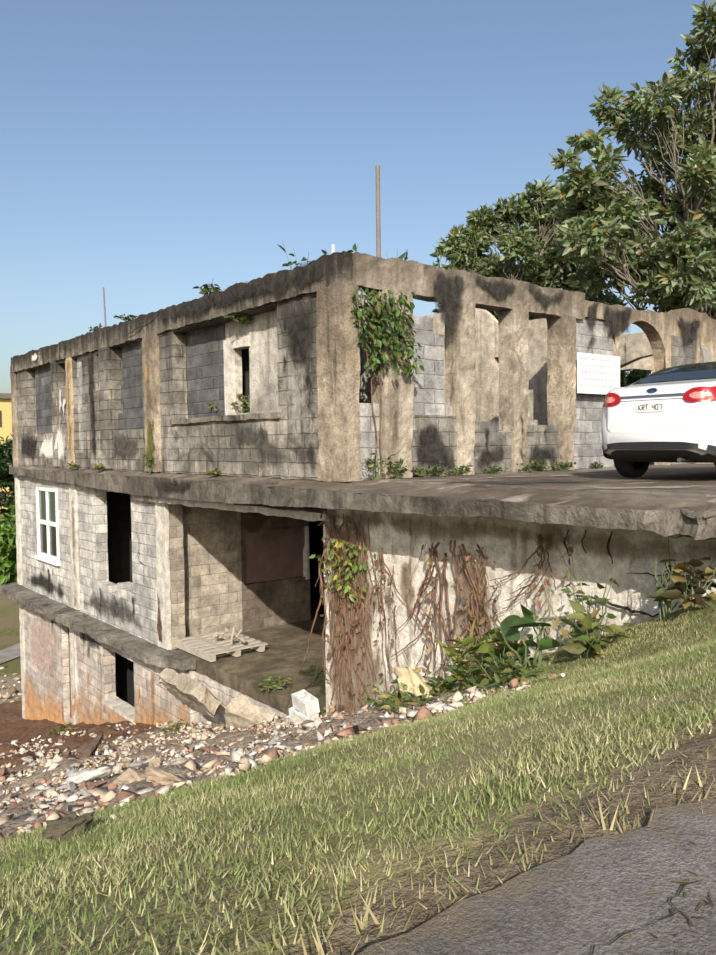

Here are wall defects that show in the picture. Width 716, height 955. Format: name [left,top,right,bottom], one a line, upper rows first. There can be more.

water stain [159,261,323,321]
water stain [283,308,314,416]
water stain [307,446,316,467]